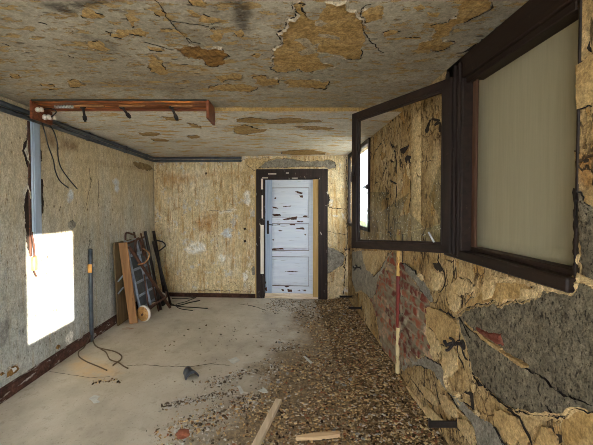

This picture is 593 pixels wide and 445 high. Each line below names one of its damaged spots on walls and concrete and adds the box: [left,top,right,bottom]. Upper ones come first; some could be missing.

crack [155,0,209,44]
peeling [208,0,384,93]
crack [360,4,384,53]
peeling [575,54,593,109]
peeling [233,117,334,135]
flaking render [244,149,336,170]
spalling [22,125,32,251]
flaking render [328,246,345,273]
flaking render [352,186,593,445]
crack [400,369,474,419]
crack [439,278,533,445]
crack [525,368,589,405]